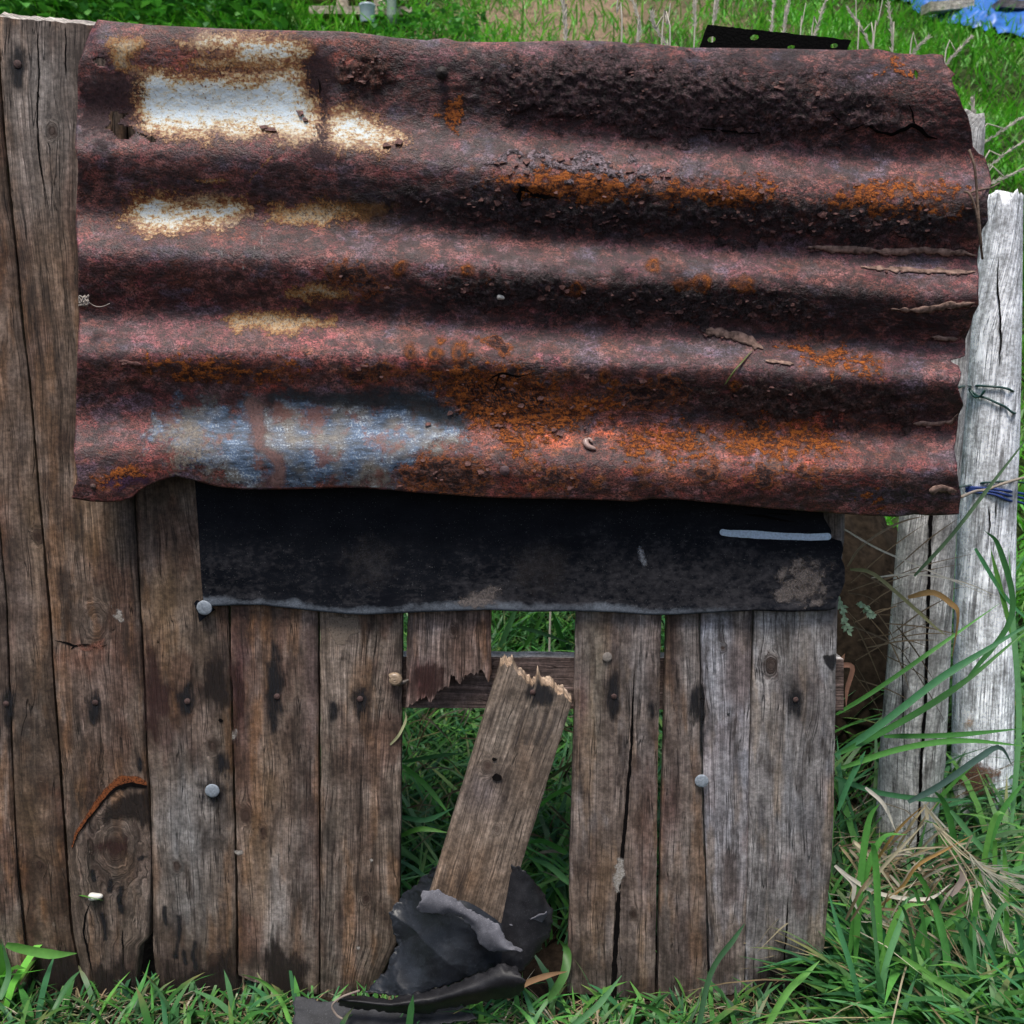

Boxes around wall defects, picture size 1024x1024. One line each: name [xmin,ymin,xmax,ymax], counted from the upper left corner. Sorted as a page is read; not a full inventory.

rust [326,43,392,108]
rust [378,44,976,275]
crack [832,105,937,139]
rust [119,344,310,391]
rust [311,257,408,304]
rust [342,334,851,500]
rust [410,258,894,388]
rust [891,301,976,313]
crack [995,257,1003,364]
rust [929,485,957,495]
crack [902,515,933,852]
crack [611,678,634,998]